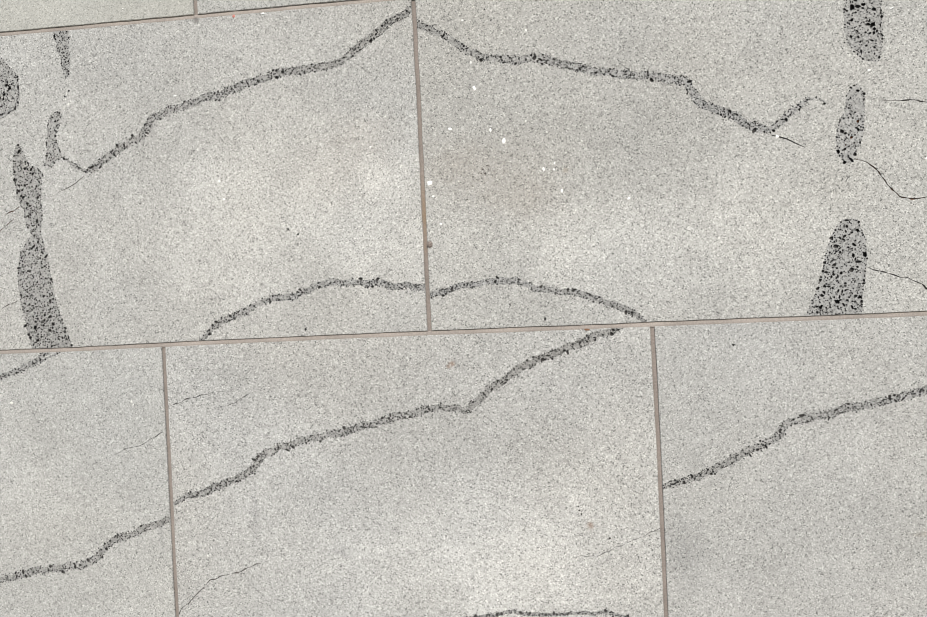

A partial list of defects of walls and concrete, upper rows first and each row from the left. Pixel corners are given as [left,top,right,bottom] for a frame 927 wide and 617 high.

spalling [0,57,20,119]
spalling [53,31,70,79]
crack [62,6,827,191]
spalling [835,83,866,164]
spalling [842,0,884,66]
spalling [13,90,73,348]
spalling [805,218,868,316]
crack [0,276,647,584]
crack [663,386,927,489]
crack [179,563,259,614]
crack [466,609,629,617]